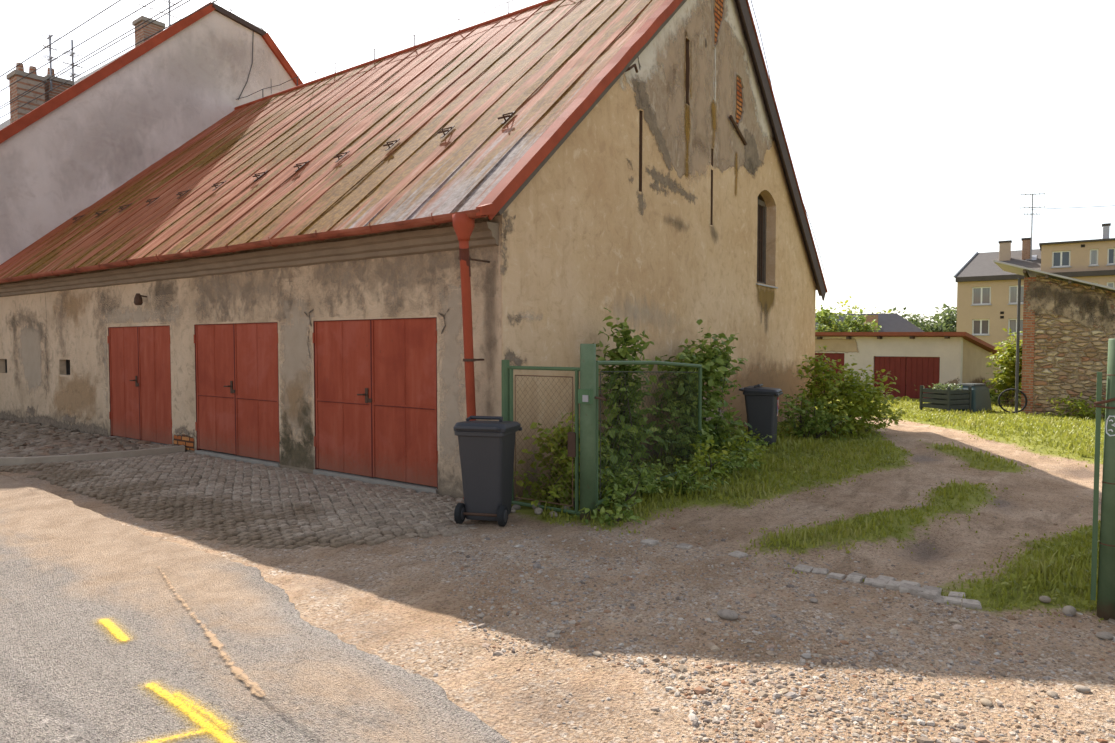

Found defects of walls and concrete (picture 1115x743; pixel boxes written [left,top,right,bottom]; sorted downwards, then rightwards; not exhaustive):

peeling [620,0,774,216]
water stain [757,287,774,330]
water stain [280,406,314,469]